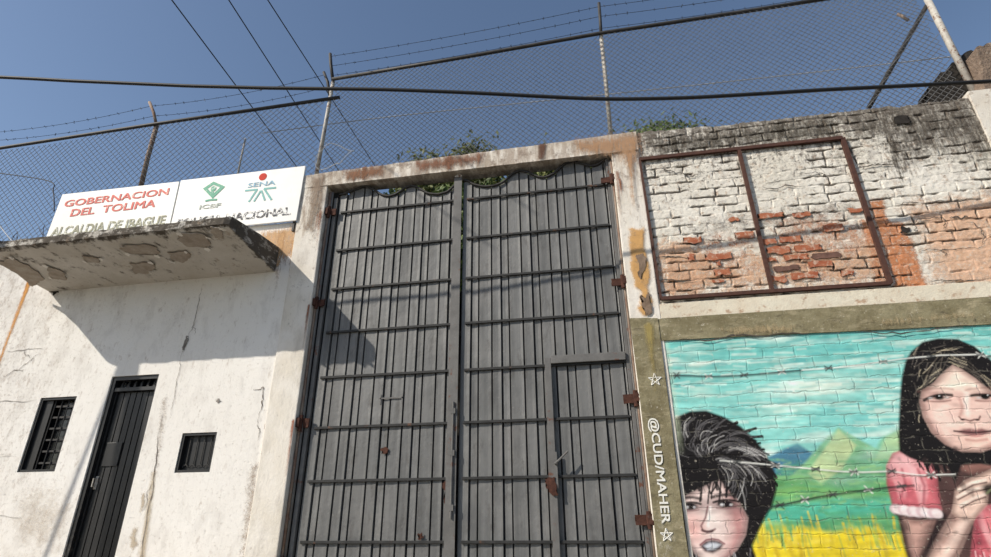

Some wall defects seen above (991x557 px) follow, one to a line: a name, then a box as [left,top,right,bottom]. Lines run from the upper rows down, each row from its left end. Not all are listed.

damp [575,135,641,198]
damp [656,119,838,153]
damp [865,108,991,179]
peeling [0,257,67,295]
peeling [119,226,226,274]
peeling [629,196,991,315]
corrosion [0,282,30,361]
crack [0,348,42,402]
crack [142,289,202,549]